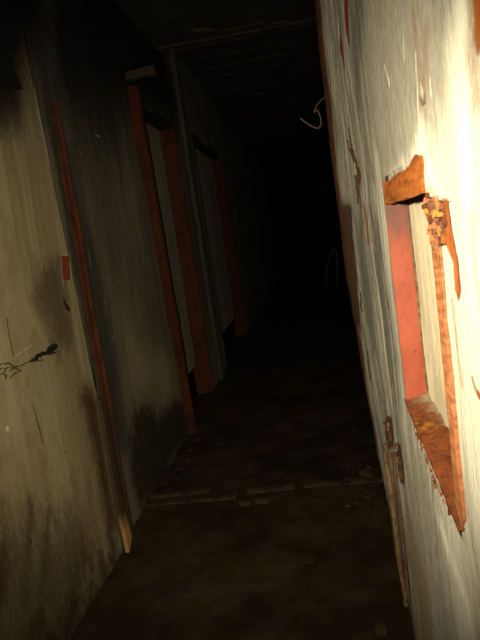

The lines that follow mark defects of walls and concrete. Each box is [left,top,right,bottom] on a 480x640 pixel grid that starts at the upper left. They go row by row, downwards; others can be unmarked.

rust [421,192,460,299]
crack [0,318,58,379]